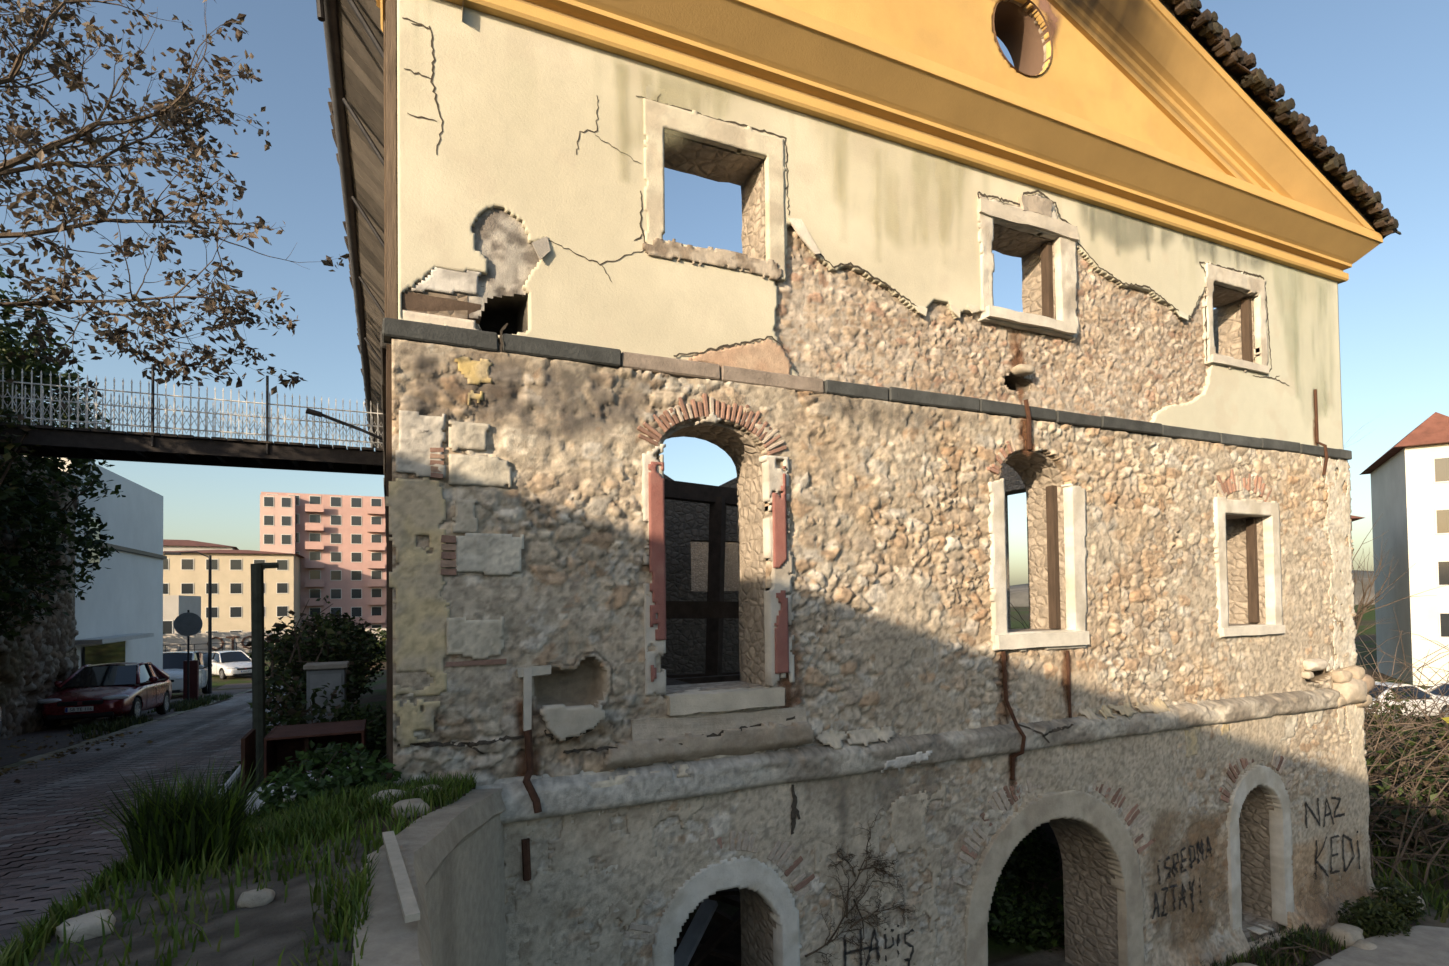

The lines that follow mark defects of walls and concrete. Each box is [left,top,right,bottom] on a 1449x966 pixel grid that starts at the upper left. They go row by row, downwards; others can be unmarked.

crack [402,17,444,155]
crack [548,96,648,282]
crack [636,94,790,215]
peeling [401,208,550,330]
peeling [642,218,1209,422]
corrosion [517,702,539,777]
spalling [534,657,608,743]
corrosion [1062,657,1071,695]